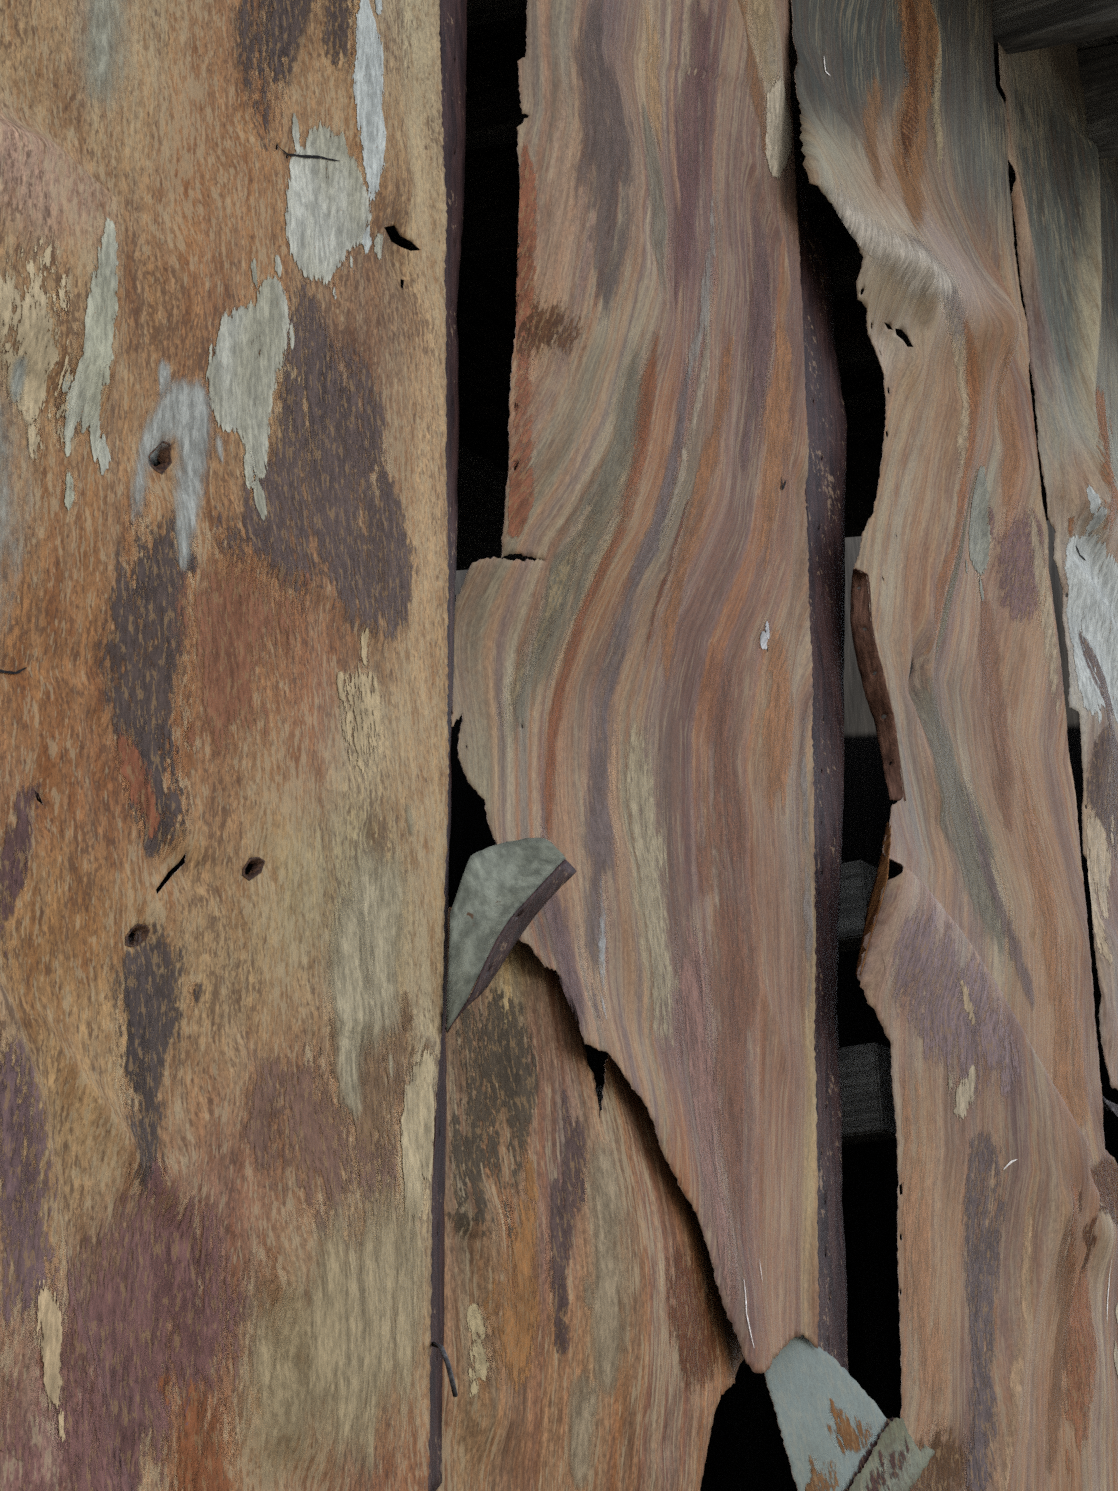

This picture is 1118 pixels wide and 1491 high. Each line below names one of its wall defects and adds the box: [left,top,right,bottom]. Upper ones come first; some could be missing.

peeling [0,217,119,510]
peeling [206,0,386,521]
rust [508,145,583,538]
rust [99,282,418,858]
peeling [1064,485,1118,724]
rust [1079,632,1118,859]
peeling [1087,812,1115,965]
peeling [36,1278,65,1443]
rust [0,922,267,1491]
peeling [467,1304,489,1398]
rust [448,988,586,1391]
rust [805,1131,1007,1491]